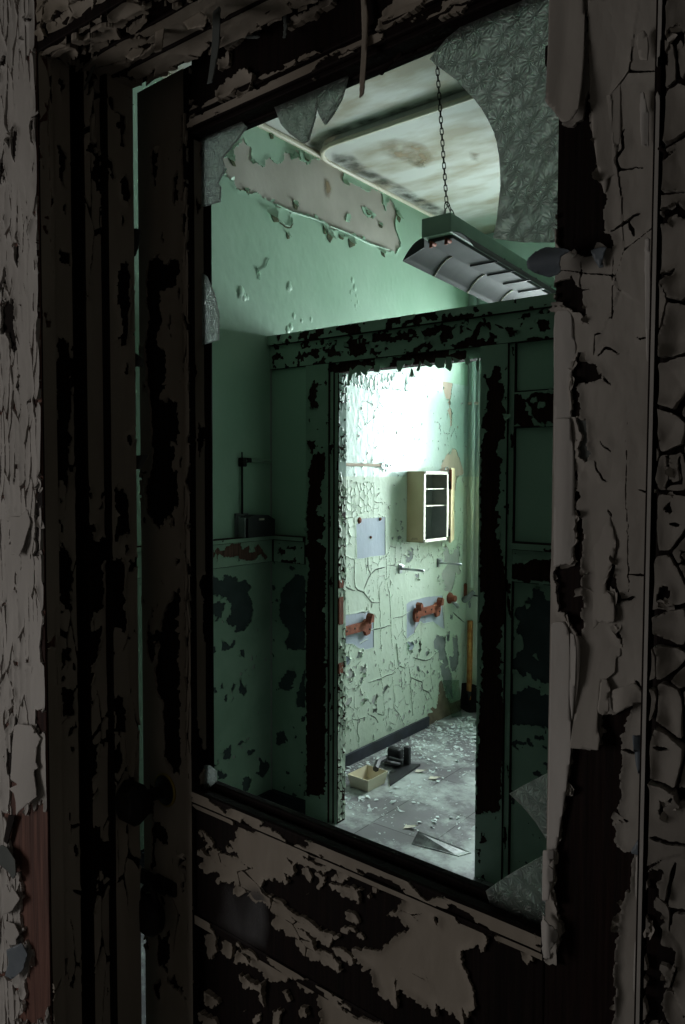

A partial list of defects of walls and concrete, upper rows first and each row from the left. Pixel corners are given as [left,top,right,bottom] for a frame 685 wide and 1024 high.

spalling [222,139,404,257]
crack [616,130,667,171]
peeling [0,271,17,352]
peeling [113,228,180,529]
peeling [147,588,181,775]
peeling [213,575,253,657]
peeling [279,440,328,797]
crack [346,480,438,739]
peeling [295,0,676,1024]
crack [595,445,646,601]
peeling [0,709,50,1024]
crack [652,836,685,844]